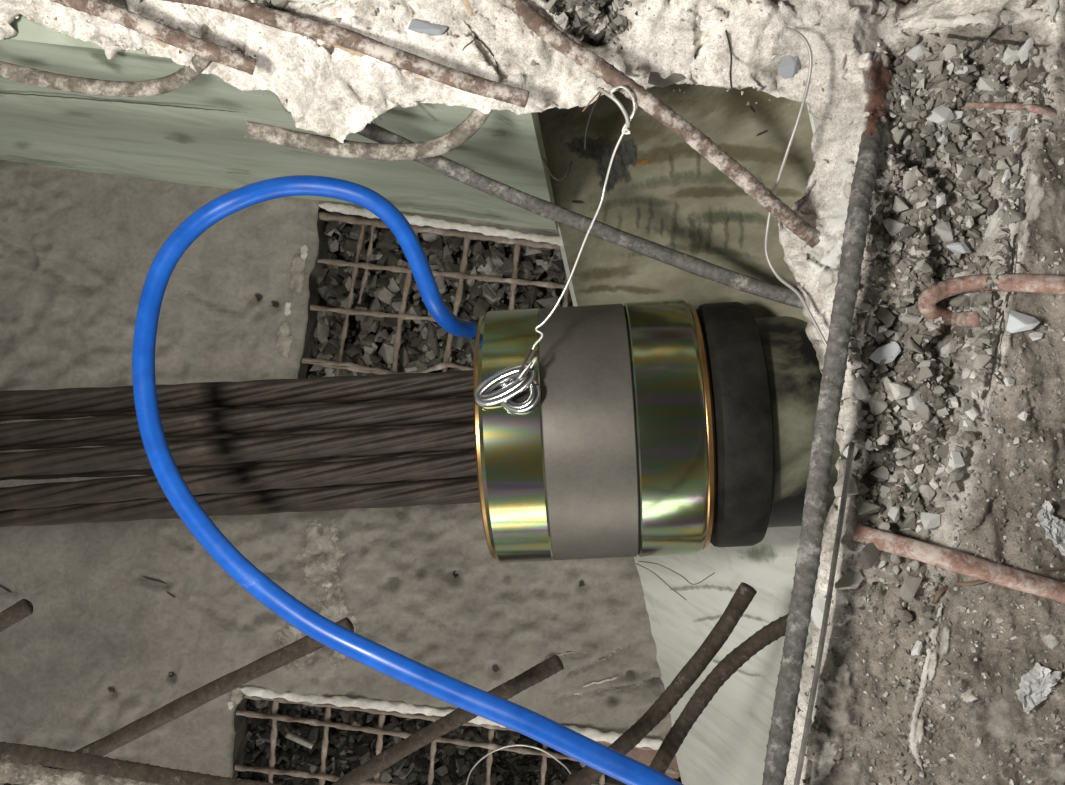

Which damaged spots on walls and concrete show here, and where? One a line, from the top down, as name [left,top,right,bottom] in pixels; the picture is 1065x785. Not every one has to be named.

spalling [0,0,257,97]
corrosion [864,54,893,136]
peeling [895,0,1059,31]
spalling [162,0,805,321]
spalling [1008,160,1065,256]
spalling [255,212,474,376]
spalling [917,273,1065,327]
spalling [488,0,886,785]
spalling [853,523,1065,603]
spalling [0,624,605,785]
peeling [908,602,949,771]
spalling [961,689,1034,743]